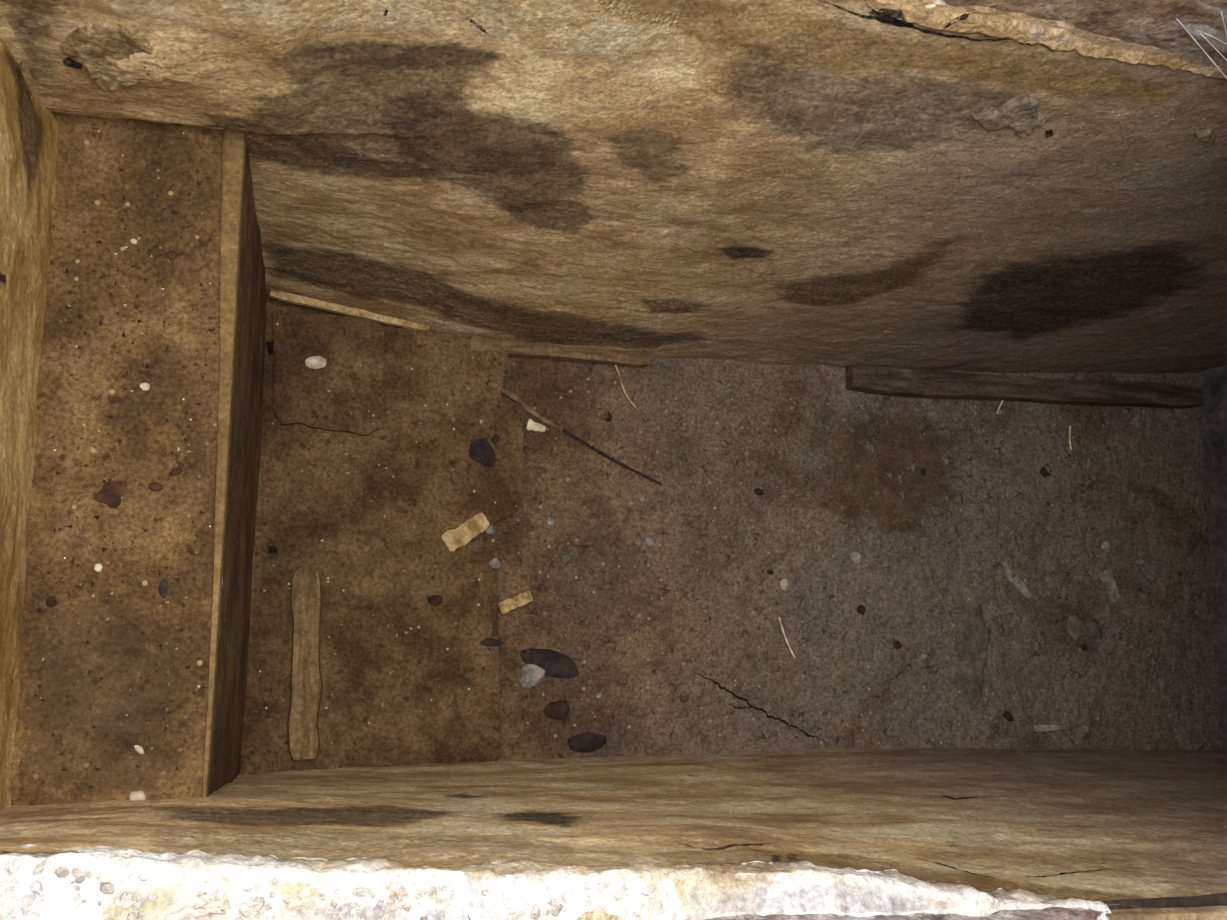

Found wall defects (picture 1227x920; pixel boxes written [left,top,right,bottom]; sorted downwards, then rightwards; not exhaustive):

leakage [80,0,1180,231]
leakage [956,243,1202,338]